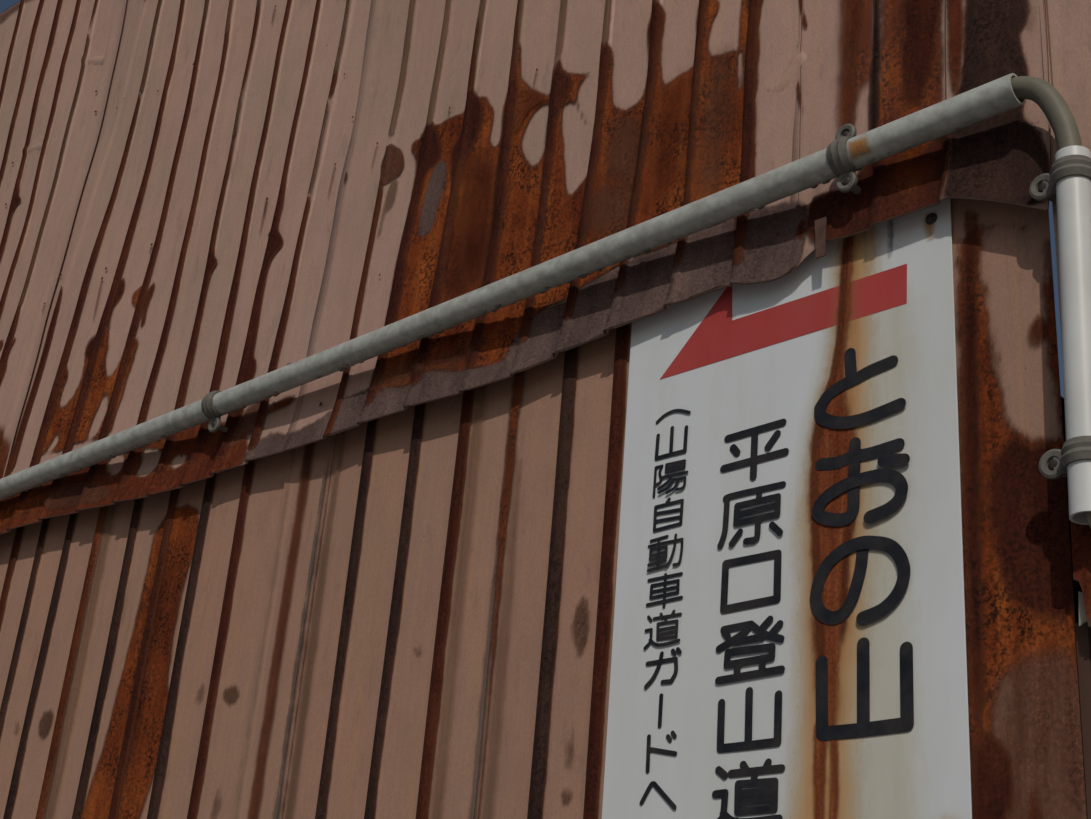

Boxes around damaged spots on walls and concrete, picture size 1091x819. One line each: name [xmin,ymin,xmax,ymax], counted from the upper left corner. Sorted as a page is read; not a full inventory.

corrosion [0,0,97,384]
corrosion [29,0,209,468]
corrosion [72,473,216,819]
corrosion [209,0,349,392]
corrosion [364,403,425,819]
corrosion [0,105,1051,533]
corrosion [527,346,579,819]
corrosion [350,0,763,340]
corrosion [583,324,629,819]
corrosion [792,423,870,819]
corrosion [839,0,1030,158]
corrosion [956,212,1091,819]